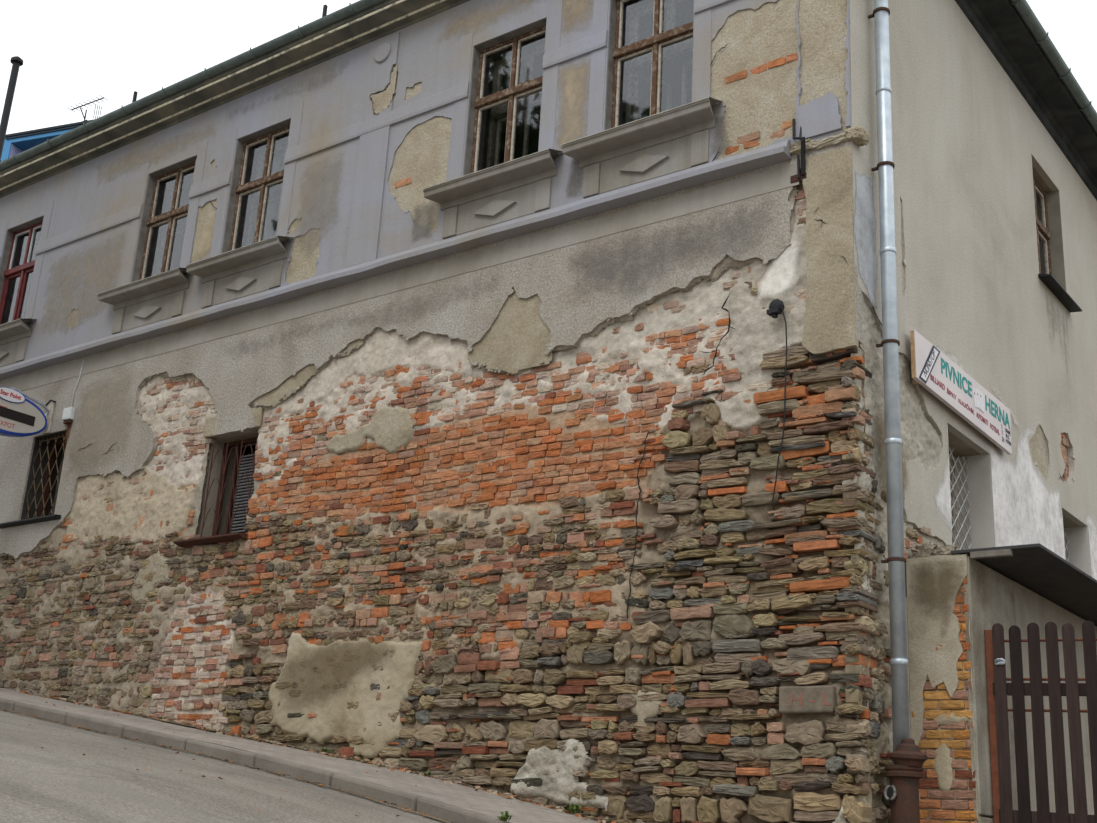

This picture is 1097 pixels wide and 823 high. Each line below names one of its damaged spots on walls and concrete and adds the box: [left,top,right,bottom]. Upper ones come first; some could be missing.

spalling [371,64,422,114]
spalling [710,0,852,159]
spalling [388,116,452,233]
spalling [0,169,893,823]
spalling [899,353,942,488]
spalling [1029,422,1048,481]
spalling [1060,433,1076,482]
spalling [903,519,944,595]
spalling [912,577,977,823]